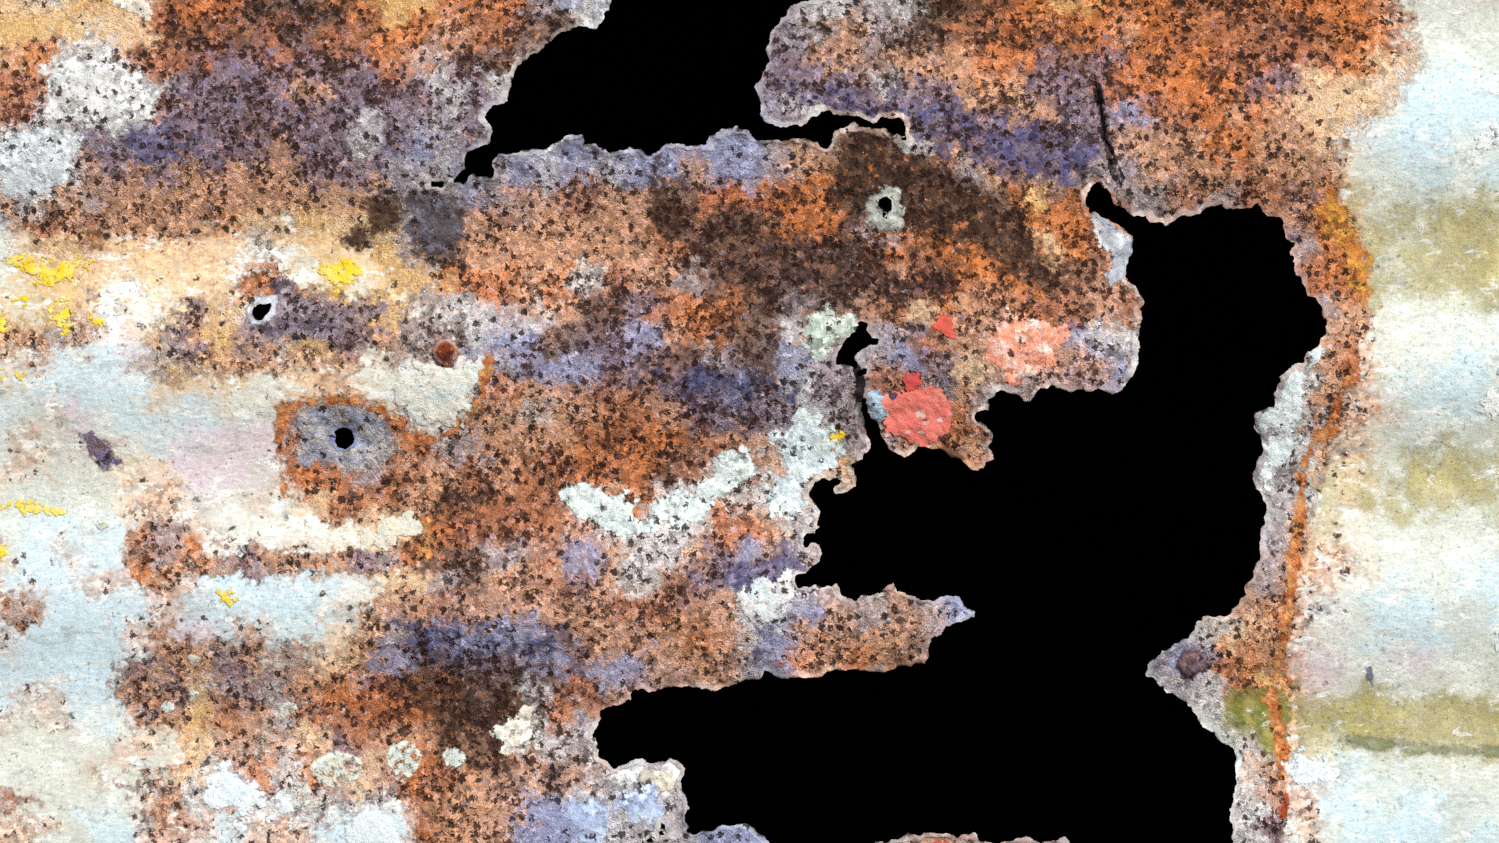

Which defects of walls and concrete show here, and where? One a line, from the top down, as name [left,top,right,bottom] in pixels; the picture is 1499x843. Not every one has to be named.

corrosion [0,308,94,368]
peeling [243,270,344,347]
corrosion [78,430,123,471]
corrosion [273,413,288,454]
corrosion [322,394,418,445]
peeling [287,354,485,477]
peeling [556,407,847,541]
peeling [1257,345,1325,492]
corrosion [122,515,206,594]
peeling [736,568,794,627]
peeling [563,768,676,843]
corrosion [646,787,760,843]